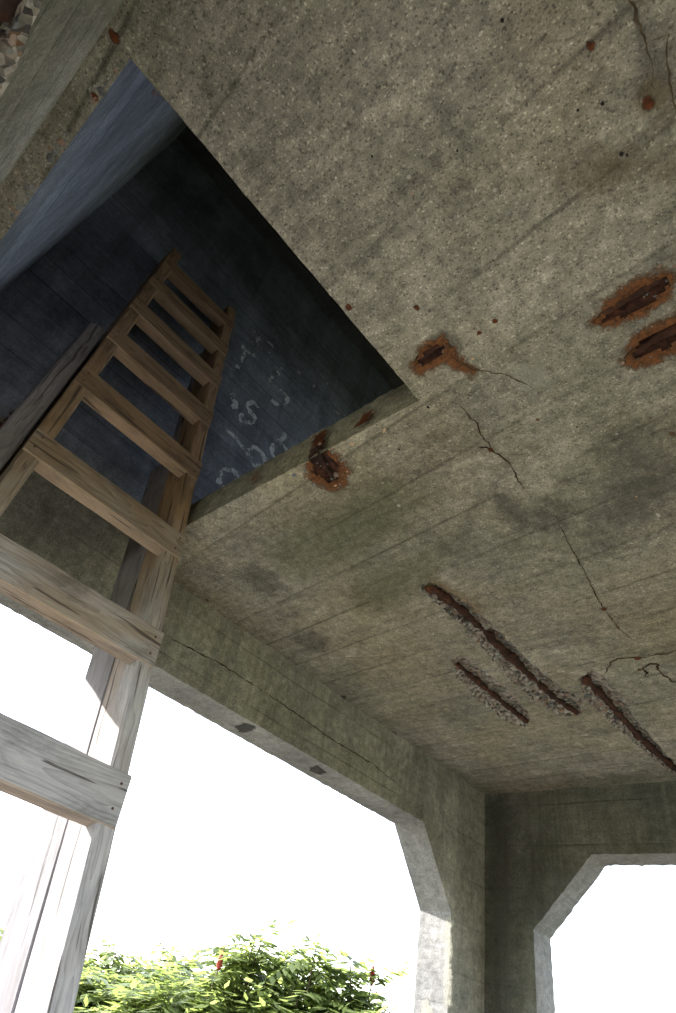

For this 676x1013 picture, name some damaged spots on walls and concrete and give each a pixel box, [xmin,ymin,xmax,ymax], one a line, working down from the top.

spalling [0,0,43,98]
crack [628,0,676,117]
crack [459,405,527,492]
crack [554,514,676,683]
spalling [413,581,676,779]